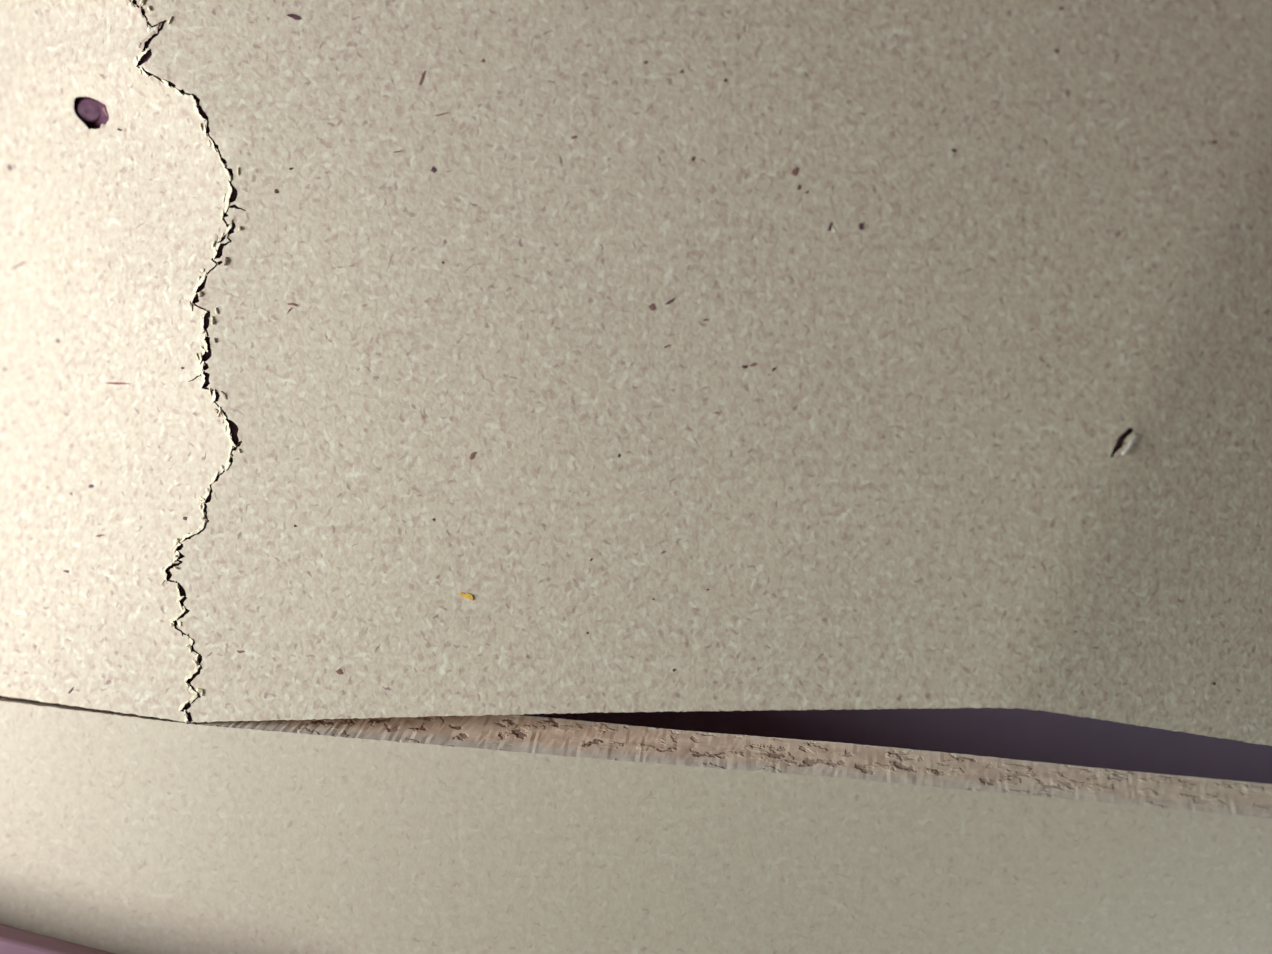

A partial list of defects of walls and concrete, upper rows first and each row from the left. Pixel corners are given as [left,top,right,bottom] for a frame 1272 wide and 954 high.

crack [128,0,246,724]